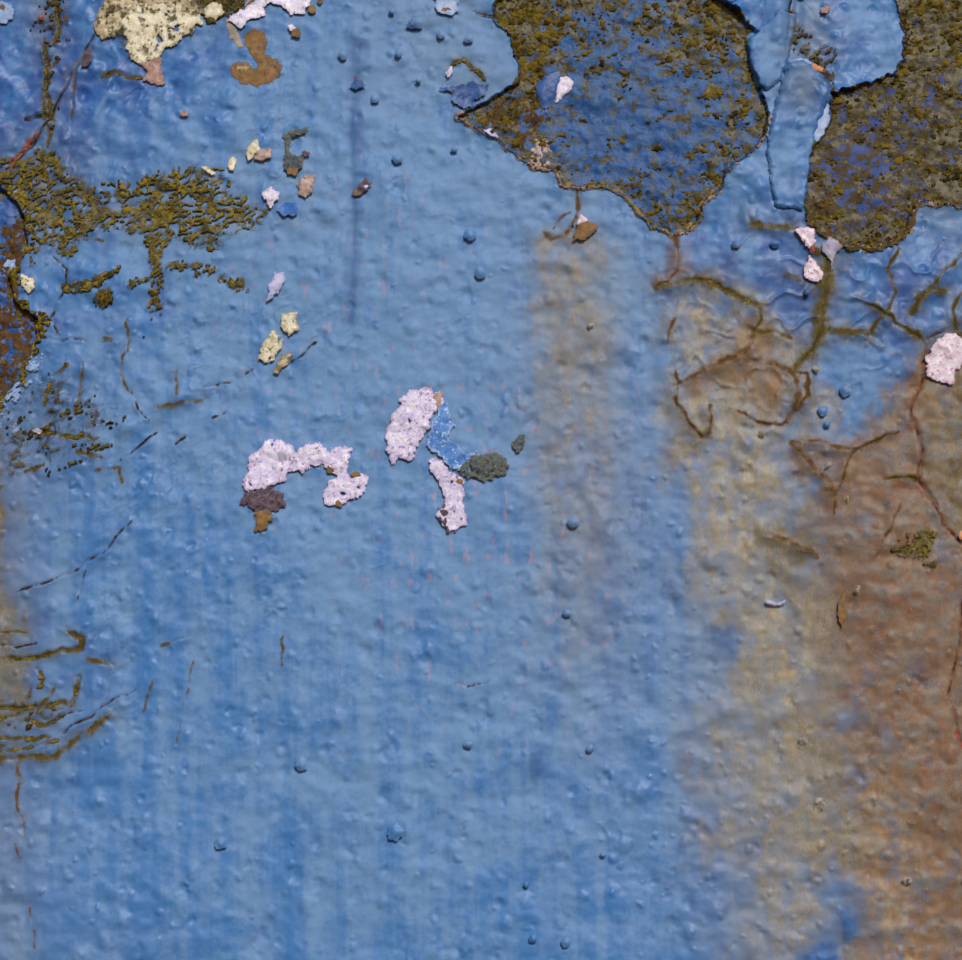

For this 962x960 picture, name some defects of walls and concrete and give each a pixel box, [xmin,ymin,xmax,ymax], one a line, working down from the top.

peeling [94,0,324,85]
peeling [8,132,38,170]
peeling [453,0,962,282]
peeling [0,182,51,429]
crack [654,216,962,544]
peeling [458,435,525,482]
crack [773,535,820,559]
crack [876,503,902,556]
crack [0,630,153,858]
corrosion [753,341,962,960]
crack [948,602,962,747]